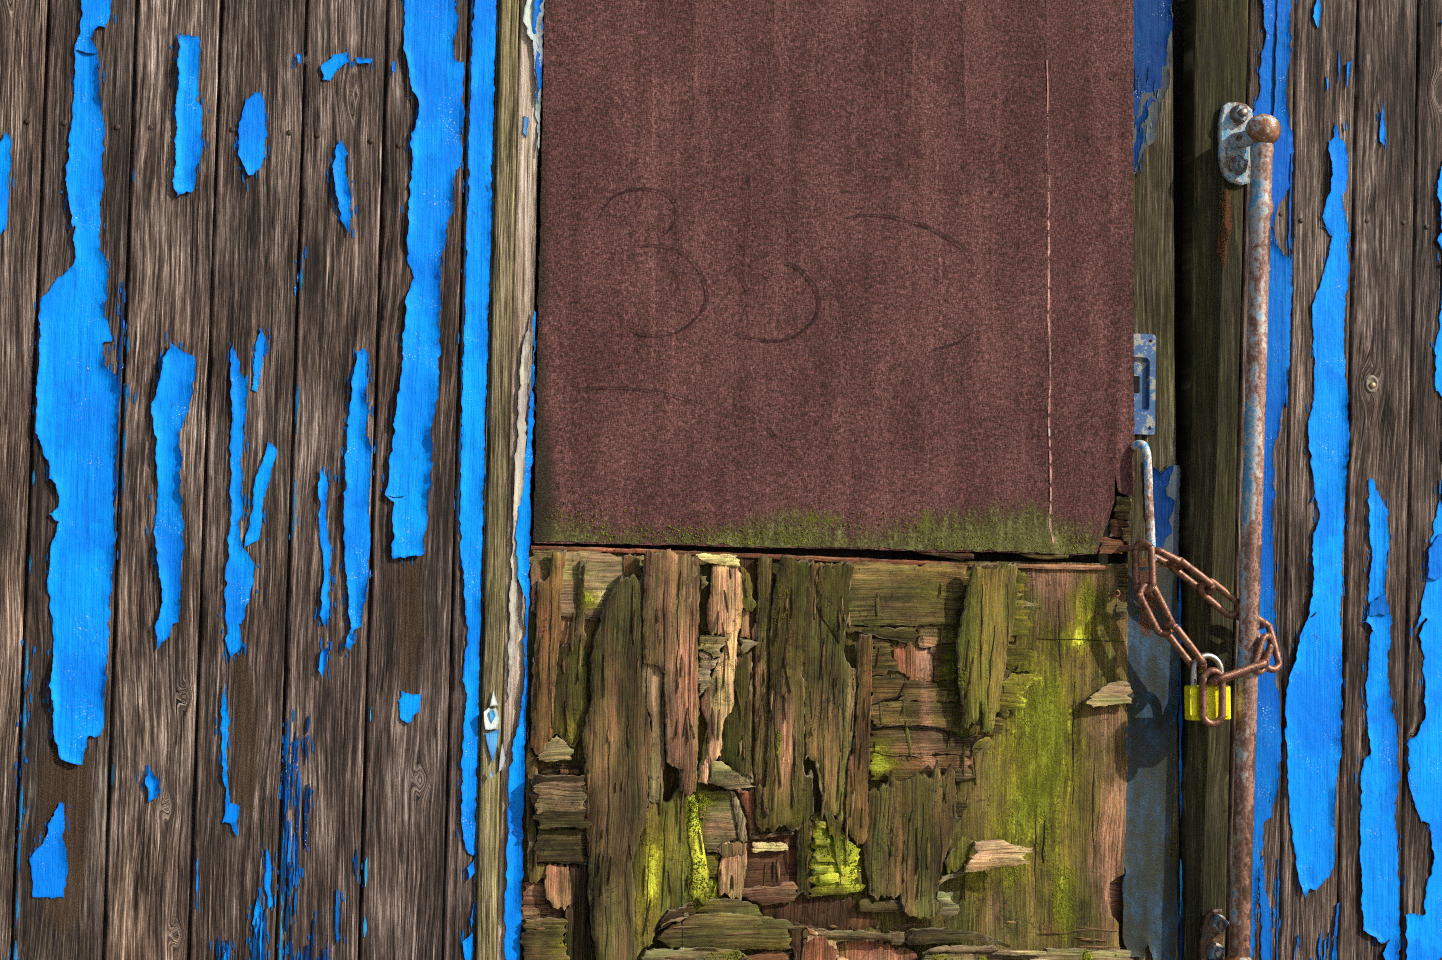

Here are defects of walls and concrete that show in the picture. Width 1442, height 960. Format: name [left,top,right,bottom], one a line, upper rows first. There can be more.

peeling [170,31,210,196]
peeling [234,91,270,191]
peeling [1133,0,1173,175]
rust [1218,192,1231,264]
peeling [6,0,196,960]
peeling [218,328,277,663]
peeling [314,0,536,960]
damp [533,163,1103,554]
rust [1139,558,1158,635]
peeling [1250,0,1442,960]
peeling [215,683,240,835]
peeling [210,709,345,960]